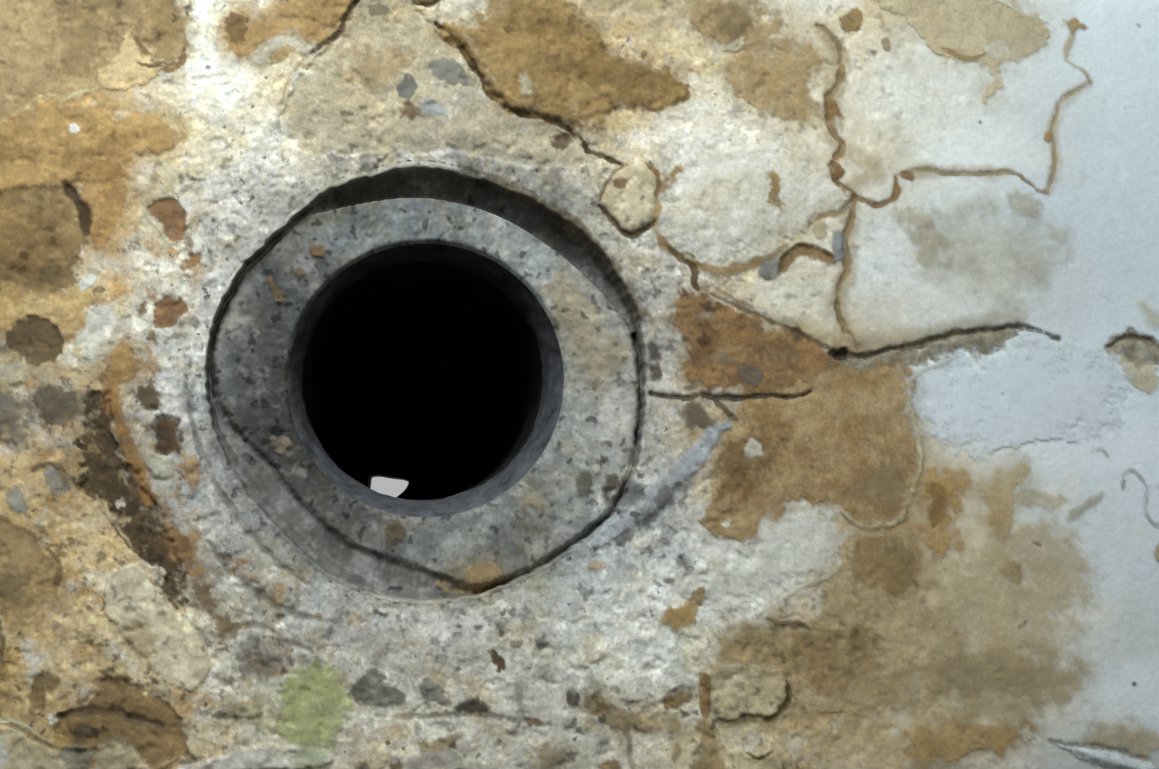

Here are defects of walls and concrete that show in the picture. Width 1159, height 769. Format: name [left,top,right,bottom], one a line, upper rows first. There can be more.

damp [0,0,192,124]
crack [285,0,361,87]
crack [402,0,623,165]
damp [584,0,689,31]
damp [877,0,1050,103]
crack [668,19,1090,371]
crack [649,391,811,428]
damp [590,421,731,548]
damp [0,514,65,618]
damp [671,508,853,611]
damp [712,624,788,670]
damp [924,523,1087,719]